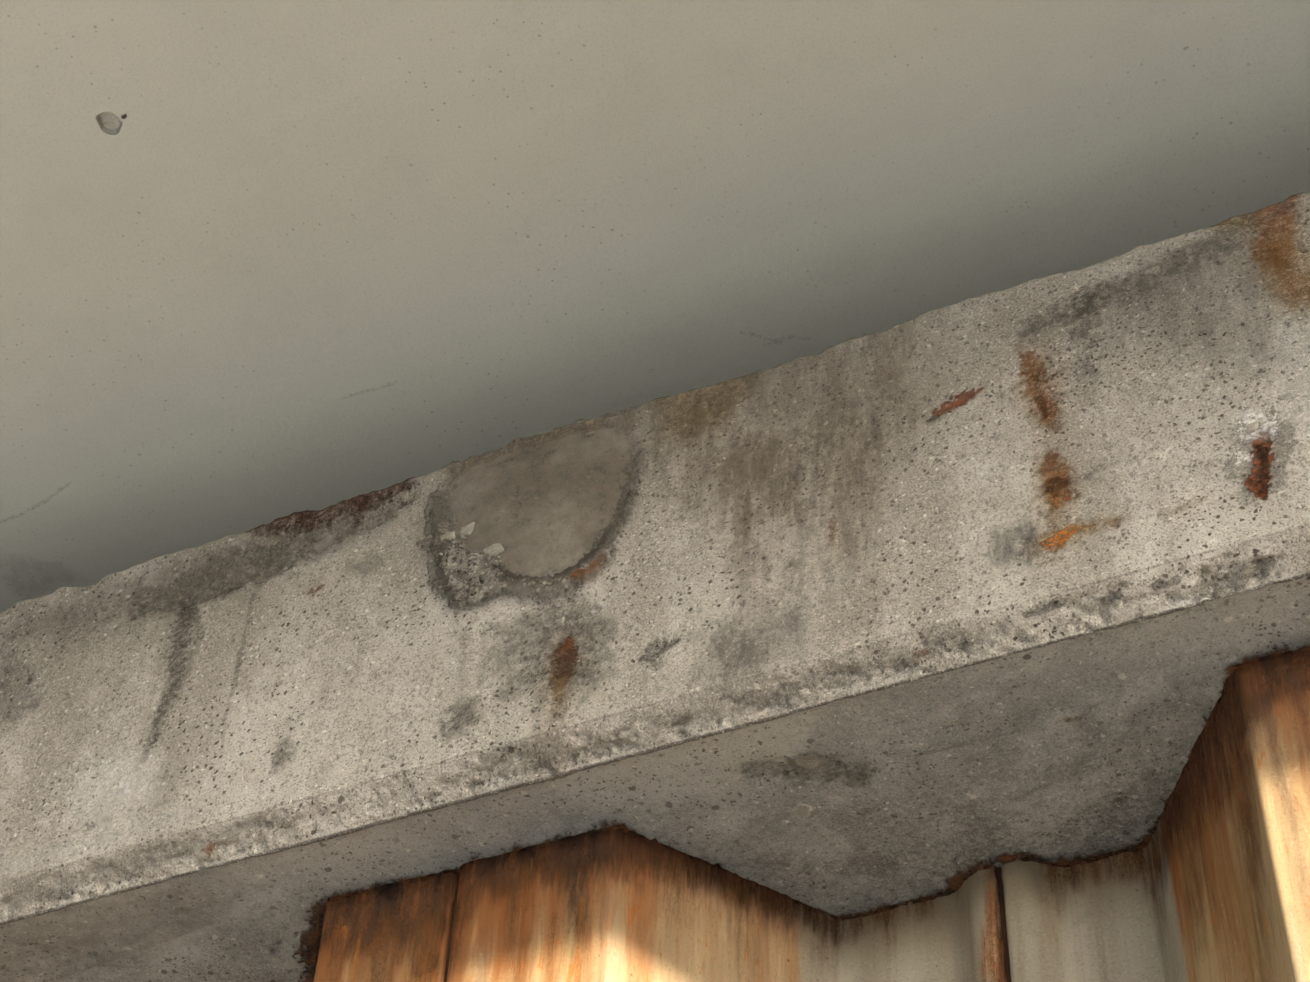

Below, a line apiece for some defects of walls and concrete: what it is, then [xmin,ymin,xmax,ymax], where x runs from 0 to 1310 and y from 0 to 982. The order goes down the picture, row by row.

corrosion [1215,194,1310,307]
corrosion [926,384,984,421]
corrosion [1020,352,1061,428]
corrosion [247,478,415,536]
corrosion [1040,448,1079,509]
corrosion [1041,524,1095,552]
corrosion [1224,413,1297,506]
corrosion [551,616,578,688]
corrosion [293,646,1310,982]